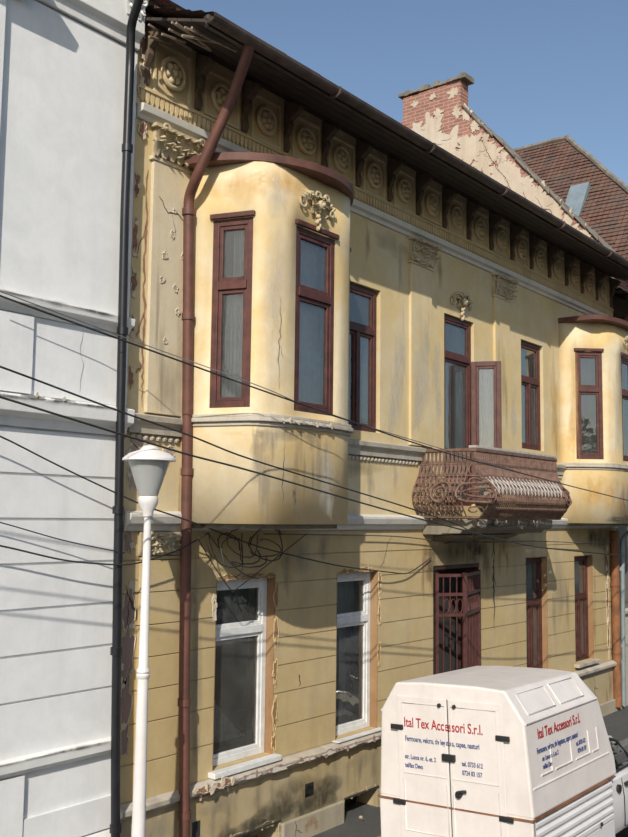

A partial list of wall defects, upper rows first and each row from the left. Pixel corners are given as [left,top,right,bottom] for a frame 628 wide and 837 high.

flaking render [134,172,142,198]
flaking render [411,87,601,244]
flaking render [130,267,138,298]
crack [136,170,183,407]
flaking render [217,571,280,648]
flaking render [120,580,136,757]
flaking render [191,735,381,801]